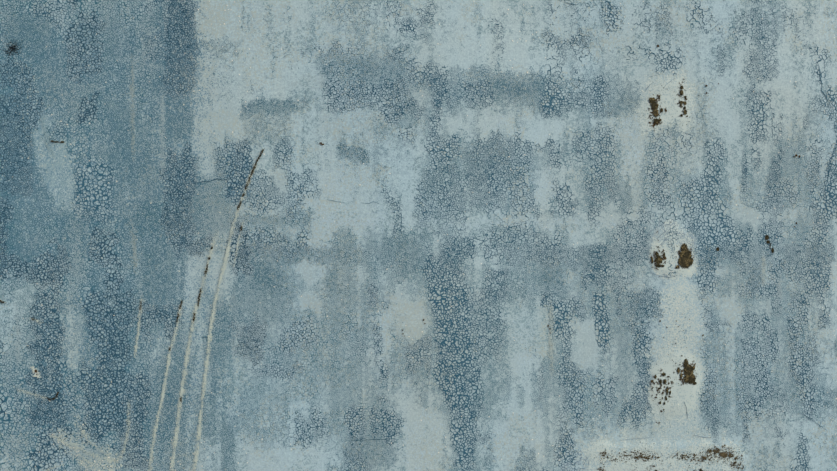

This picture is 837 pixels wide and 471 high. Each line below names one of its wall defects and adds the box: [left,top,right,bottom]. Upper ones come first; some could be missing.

crack [10,0,131,84]
crack [136,0,199,142]
crack [623,0,683,86]
rust [645,94,667,131]
rust [676,79,688,117]
crack [733,0,784,205]
rust [649,243,694,270]
crack [327,393,407,471]
rust [598,444,745,471]
rust [649,355,697,412]
crack [695,365,738,444]
crack [736,312,789,442]